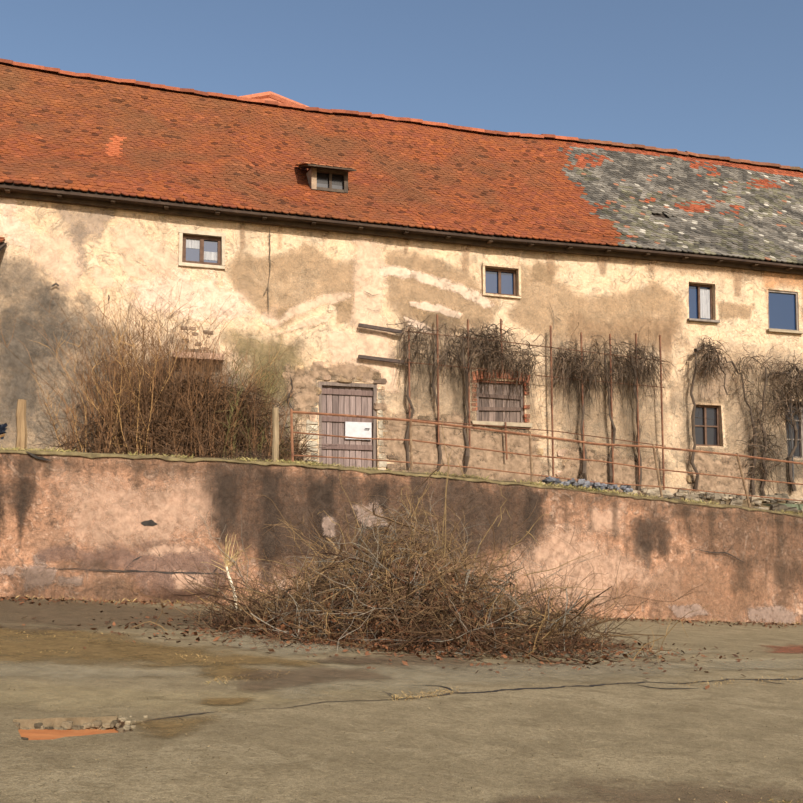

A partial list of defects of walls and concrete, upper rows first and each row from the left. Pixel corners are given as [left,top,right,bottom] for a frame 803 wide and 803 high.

water stain [720,303,750,318]
water stain [0,206,181,447]
water stain [0,248,709,635]
efflorescence [748,606,797,624]
water stain [239,655,648,690]
crack [287,678,803,708]
hole [13,715,152,740]
crack [132,711,218,725]